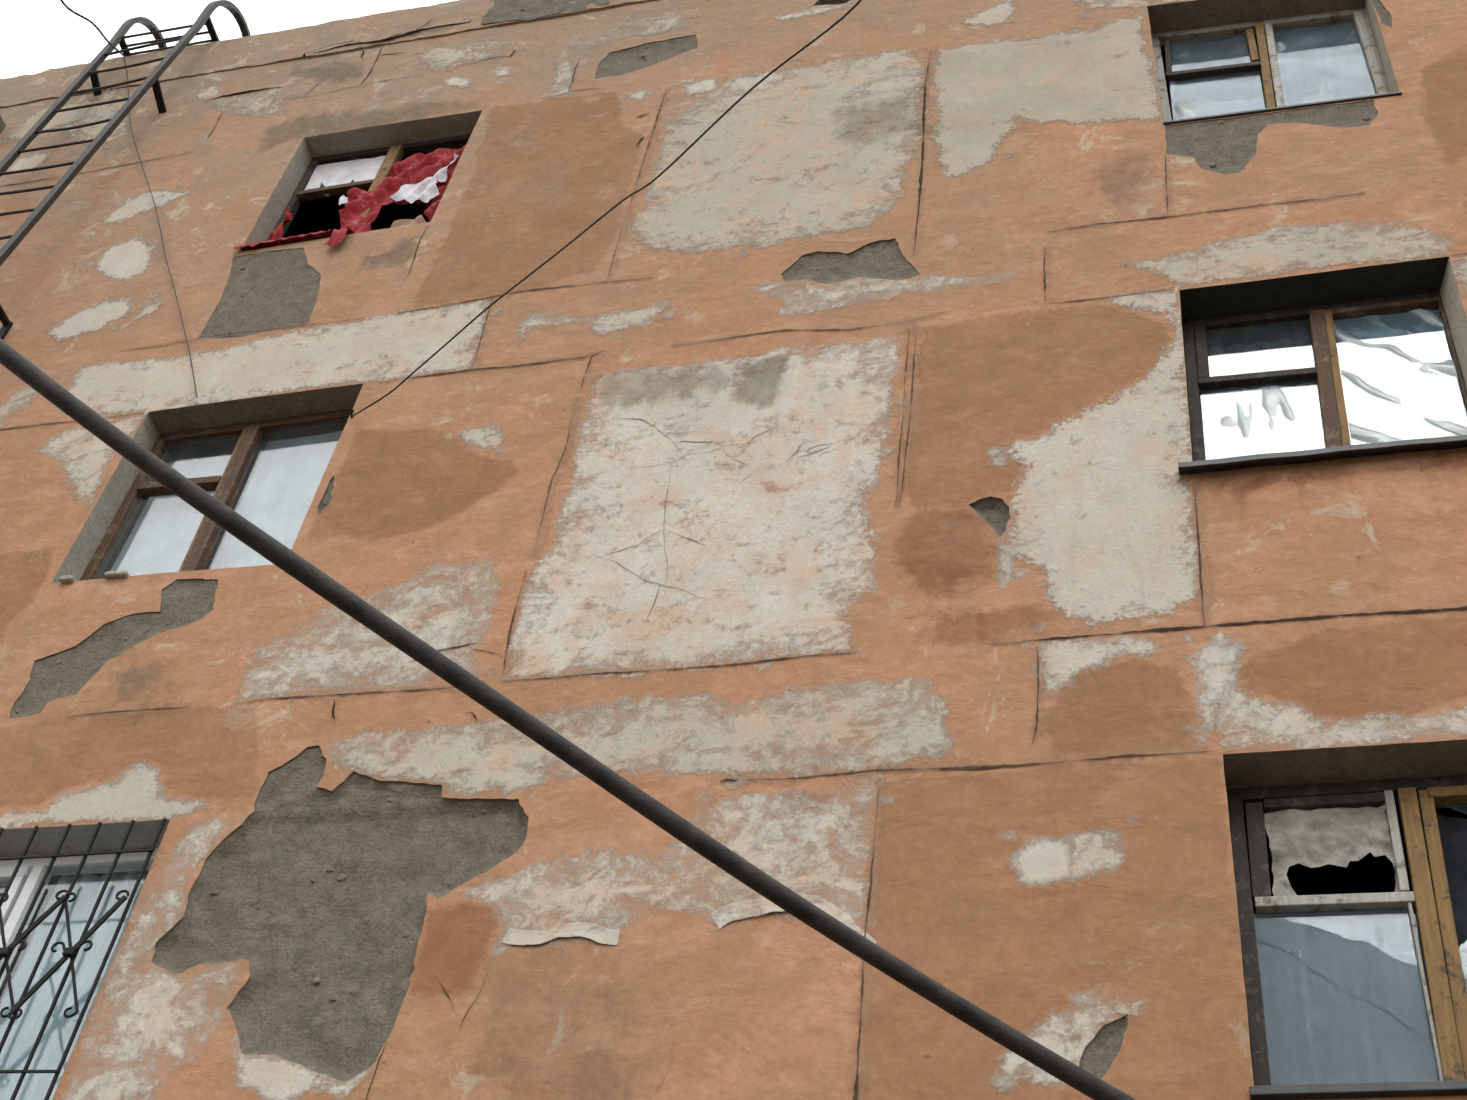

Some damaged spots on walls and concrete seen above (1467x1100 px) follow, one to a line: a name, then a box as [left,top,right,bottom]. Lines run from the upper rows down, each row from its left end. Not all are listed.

peeling [622,0,1378,315]
peeling [68,248,499,436]
crack [236,87,857,720]
peeling [969,220,1467,695]
flaking render [10,578,218,719]
peeling [242,608,431,699]
crack [366,1042,387,1099]
flaking render [0,718,788,1100]
peeling [361,561,498,675]
peeling [503,337,953,944]
peeling [1028,994,1145,1080]
crack [720,479,1467,1100]